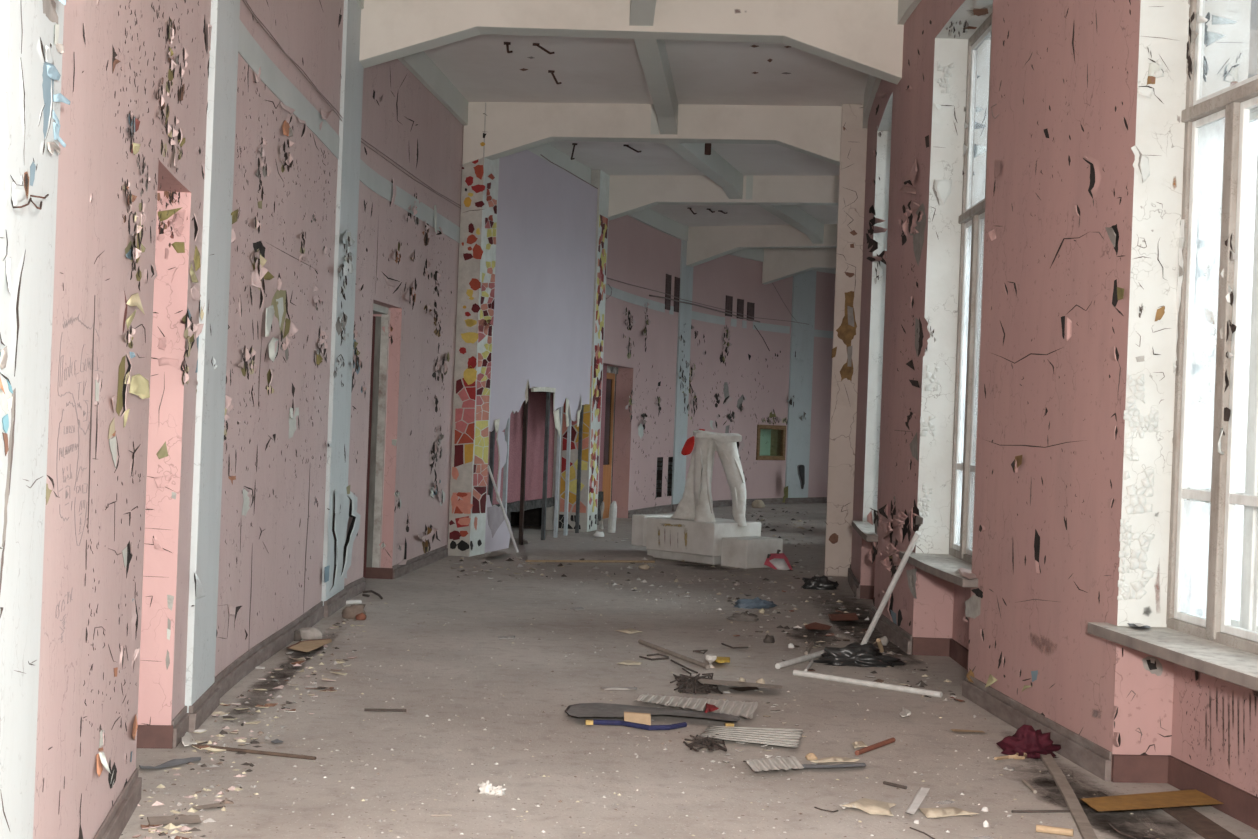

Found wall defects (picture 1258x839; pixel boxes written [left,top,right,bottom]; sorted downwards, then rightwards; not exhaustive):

peeling [898,158,926,266]
crack [932,179,952,237]
peeling [108,111,205,471]
peeling [223,102,299,450]
peeling [901,281,940,391]
crack [969,8,1170,649]
peeling [0,334,13,456]
peeling [324,485,361,593]
spalling [656,457,673,497]
peeling [894,408,936,470]
peeling [1117,374,1159,600]
crack [1079,690,1165,746]